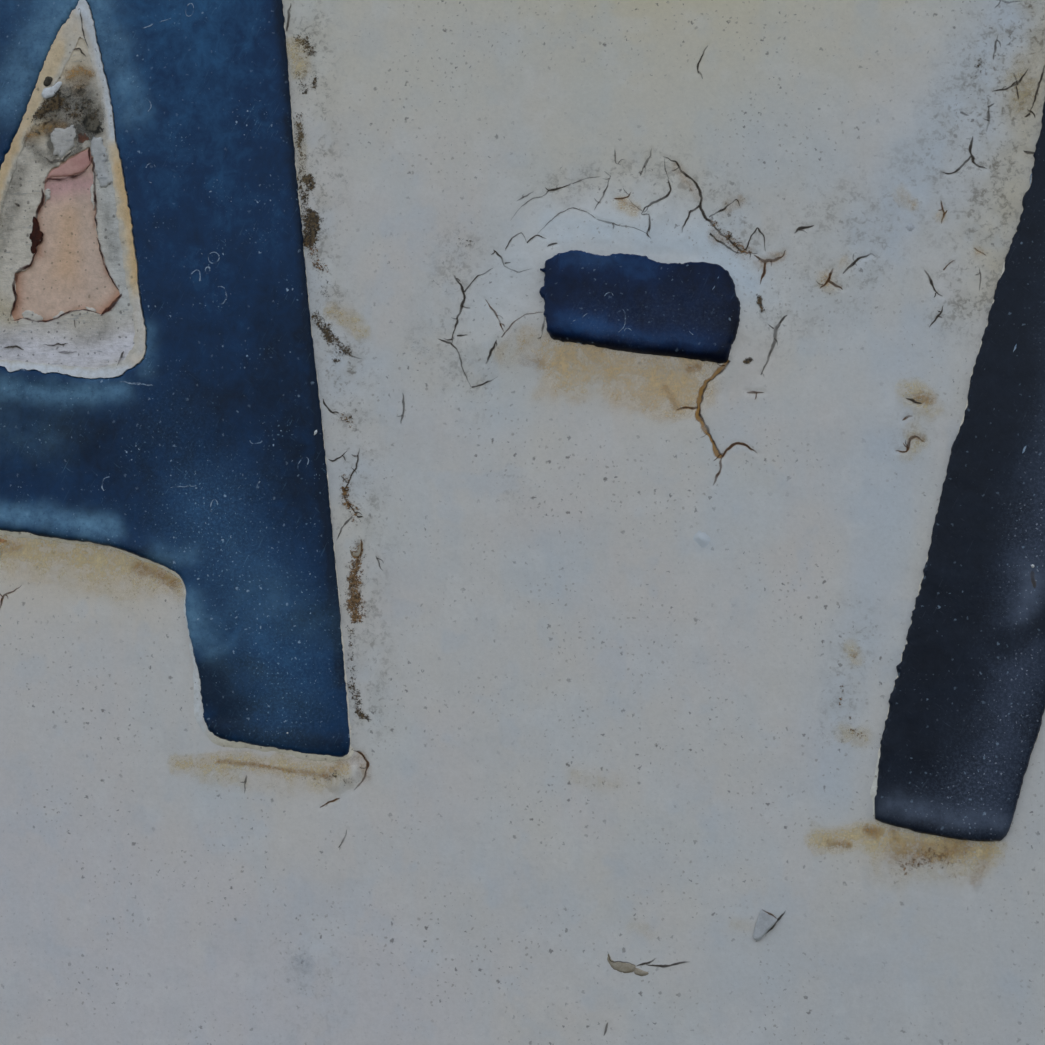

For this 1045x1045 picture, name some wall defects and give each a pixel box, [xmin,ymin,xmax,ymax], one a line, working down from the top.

crack [943,69,1044,174]
peeling [0,0,146,379]
crack [439,153,814,399]
crack [927,261,953,327]
corrosion [541,342,703,413]
crack [681,360,755,479]
crack [896,398,924,453]
corrosion [810,826,999,878]
peeling [607,954,686,976]